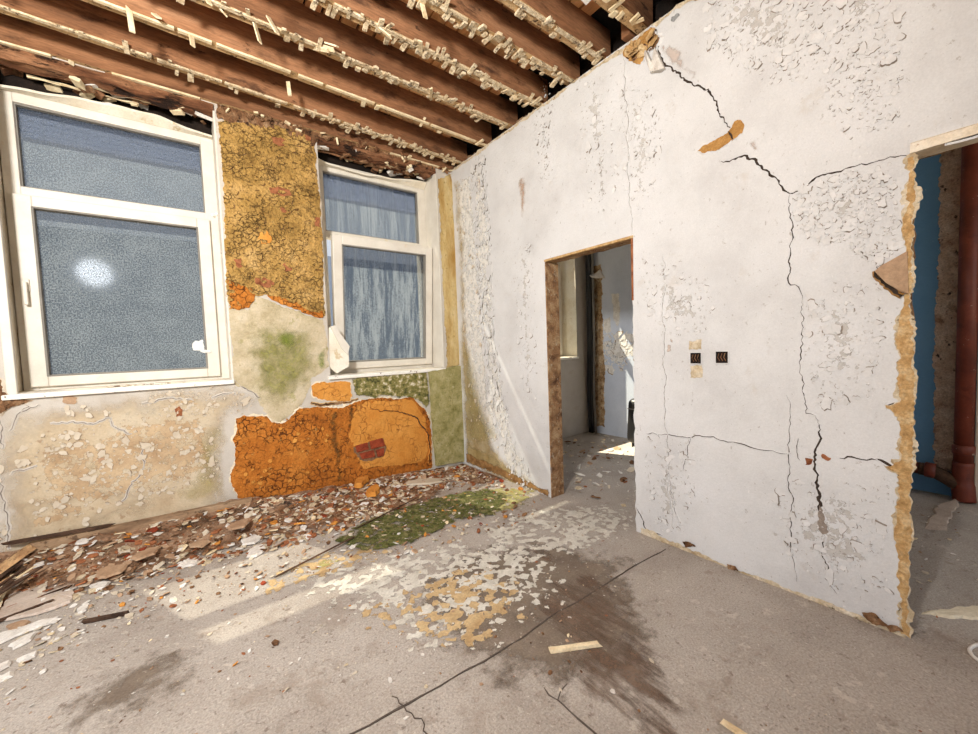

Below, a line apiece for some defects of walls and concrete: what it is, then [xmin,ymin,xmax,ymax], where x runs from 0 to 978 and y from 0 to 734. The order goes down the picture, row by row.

peeling [0,65,24,78]
peeling [44,75,154,110]
crack [656,45,732,130]
crack [945,134,978,146]
flaking render [169,0,923,652]
flaking render [932,148,961,472]
crack [0,403,146,550]
water stain [5,296,330,552]
flaking render [0,378,434,537]
crack [350,153,907,734]
water stain [423,542,675,708]
water stain [641,717,674,734]